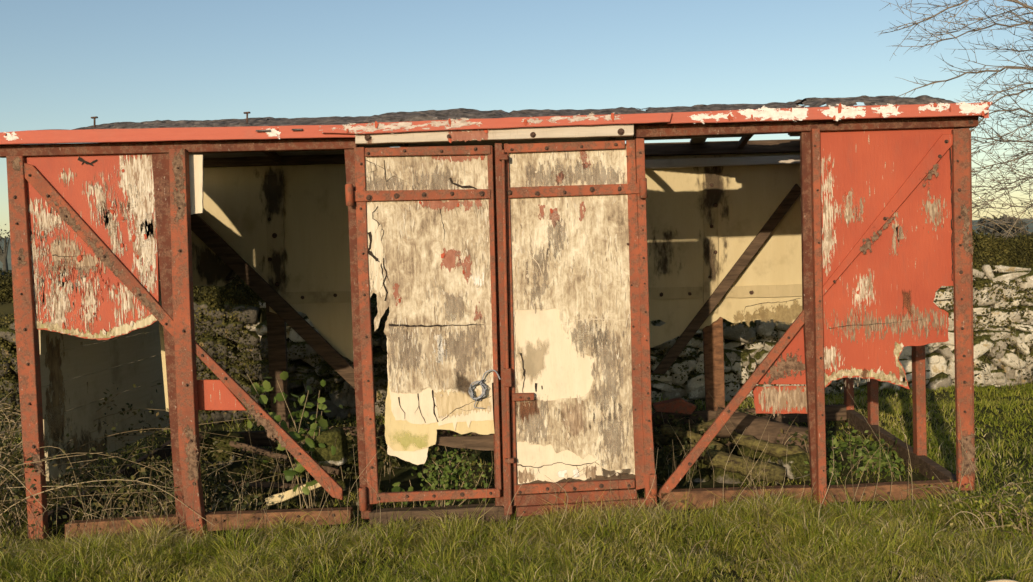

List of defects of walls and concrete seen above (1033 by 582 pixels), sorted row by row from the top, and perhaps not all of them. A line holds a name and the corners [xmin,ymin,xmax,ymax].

peeling [521,112,623,126]
peeling [689,106,808,124]
peeling [821,103,902,121]
peeling [918,101,993,116]
peeling [17,154,169,334]
peeling [367,202,386,297]
peeling [821,156,869,272]
peeling [859,210,908,255]
peeling [917,164,975,256]
peeling [852,269,876,308]
peeling [824,345,843,374]
peeling [556,399,609,442]